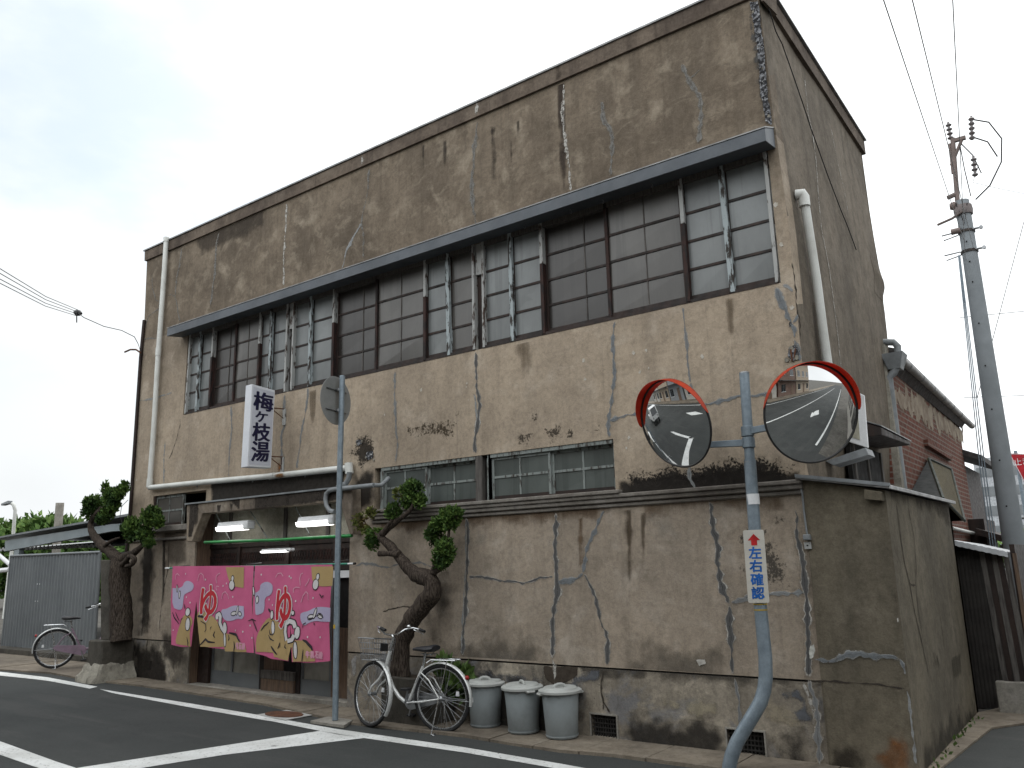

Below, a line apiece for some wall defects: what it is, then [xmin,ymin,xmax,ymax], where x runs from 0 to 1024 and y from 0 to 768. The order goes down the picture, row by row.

crack [560,85,572,190]
crack [681,64,704,143]
spalling [750,1,772,125]
crack [473,352,482,453]
crack [606,322,636,436]
water stain [620,456,798,493]
water stain [627,511,645,546]
crack [461,511,611,712]
crack [687,467,928,764]